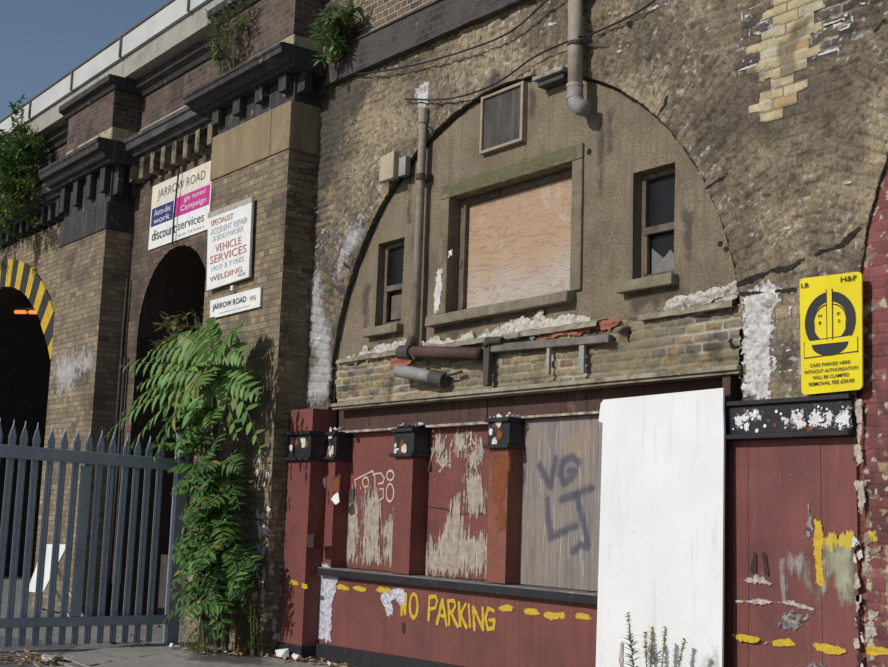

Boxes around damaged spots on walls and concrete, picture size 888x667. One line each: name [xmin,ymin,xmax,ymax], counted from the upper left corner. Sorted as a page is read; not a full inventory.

leakage [336,227,362,276]
leakage [54,348,92,393]
leakage [307,272,331,400]
flaking render [421,310,620,347]
peeling [638,279,864,465]
peeling [346,485,394,567]
peeling [425,412,521,580]
rust [490,453,510,530]
peeling [854,480,866,514]
spalling [744,552,772,586]
spalling [778,610,813,631]
peeling [852,532,888,667]